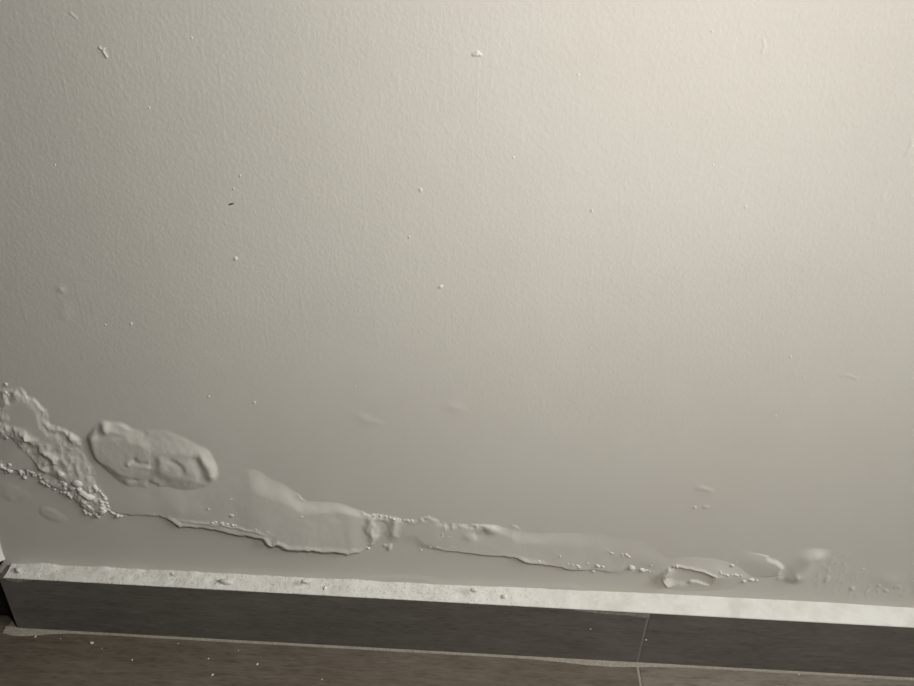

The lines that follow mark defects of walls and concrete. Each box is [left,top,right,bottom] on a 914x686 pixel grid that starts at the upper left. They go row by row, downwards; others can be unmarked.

peeling [107,468,758,592]